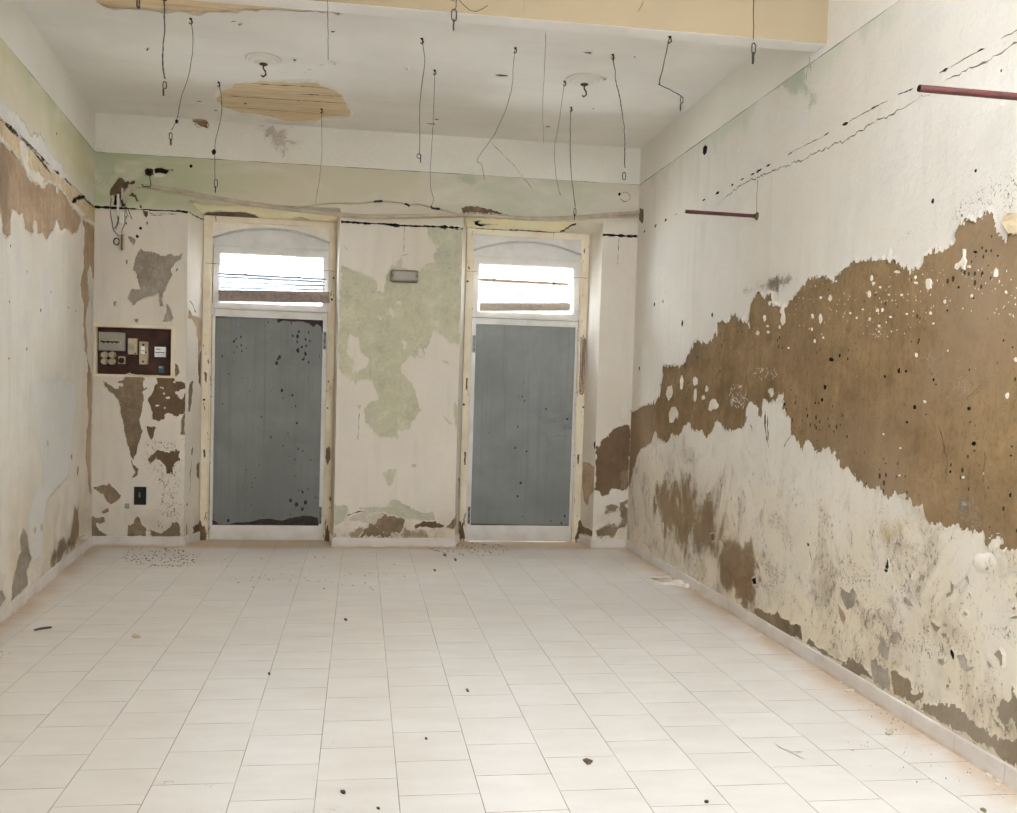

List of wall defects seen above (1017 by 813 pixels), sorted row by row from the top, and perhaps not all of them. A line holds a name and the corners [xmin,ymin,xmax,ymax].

spalling [94,0,344,26]
spalling [212,78,353,123]
crack [718,42,1017,204]
peeling [0,100,202,537]
peeling [109,166,577,324]
peeling [580,204,1017,559]
spalling [359,474,460,538]
water stain [653,466,797,611]